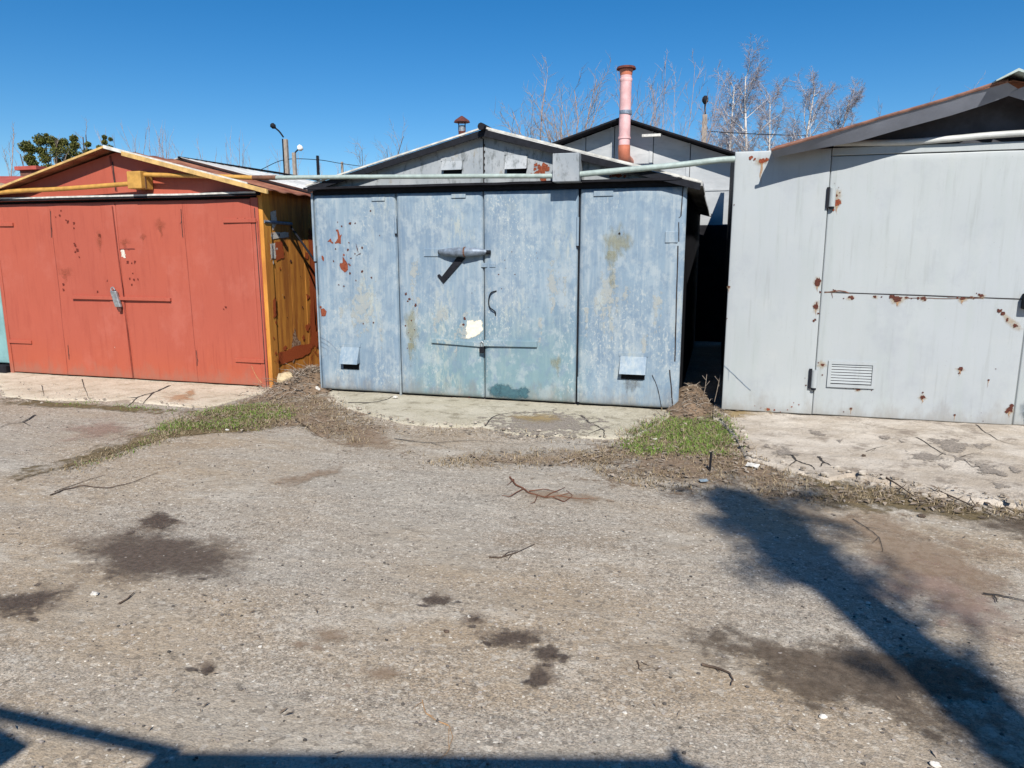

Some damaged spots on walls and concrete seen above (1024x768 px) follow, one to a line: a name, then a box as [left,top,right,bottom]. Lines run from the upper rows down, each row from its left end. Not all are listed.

rust [531,162,550,181]
rust [328,230,351,272]
rust [813,278,854,322]
rust [873,293,984,306]
peeling [432,307,483,354]